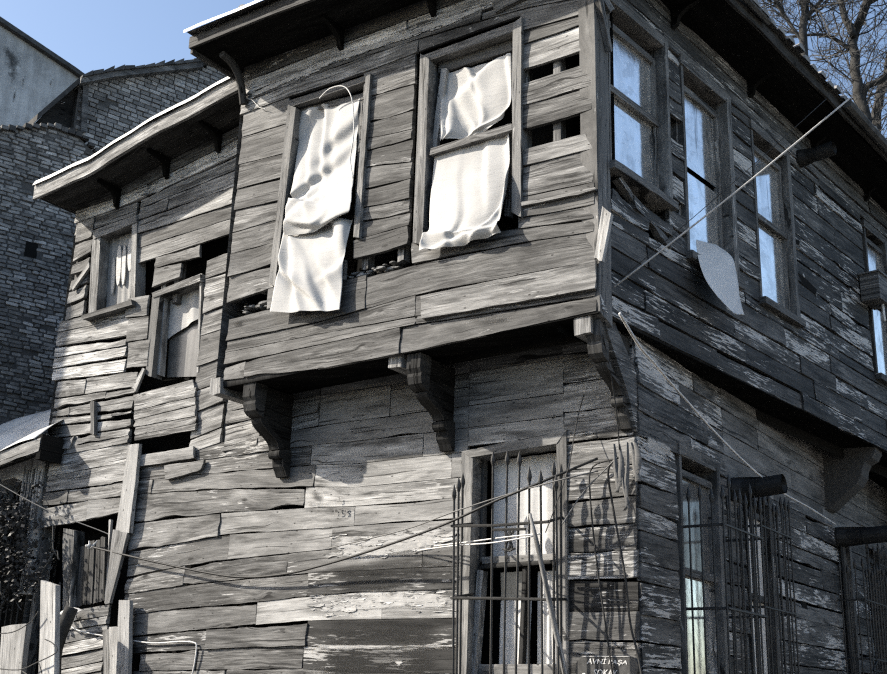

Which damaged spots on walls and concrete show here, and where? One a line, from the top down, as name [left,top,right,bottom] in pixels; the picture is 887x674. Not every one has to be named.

peeling [639,437,674,461]
peeling [306,589,456,617]